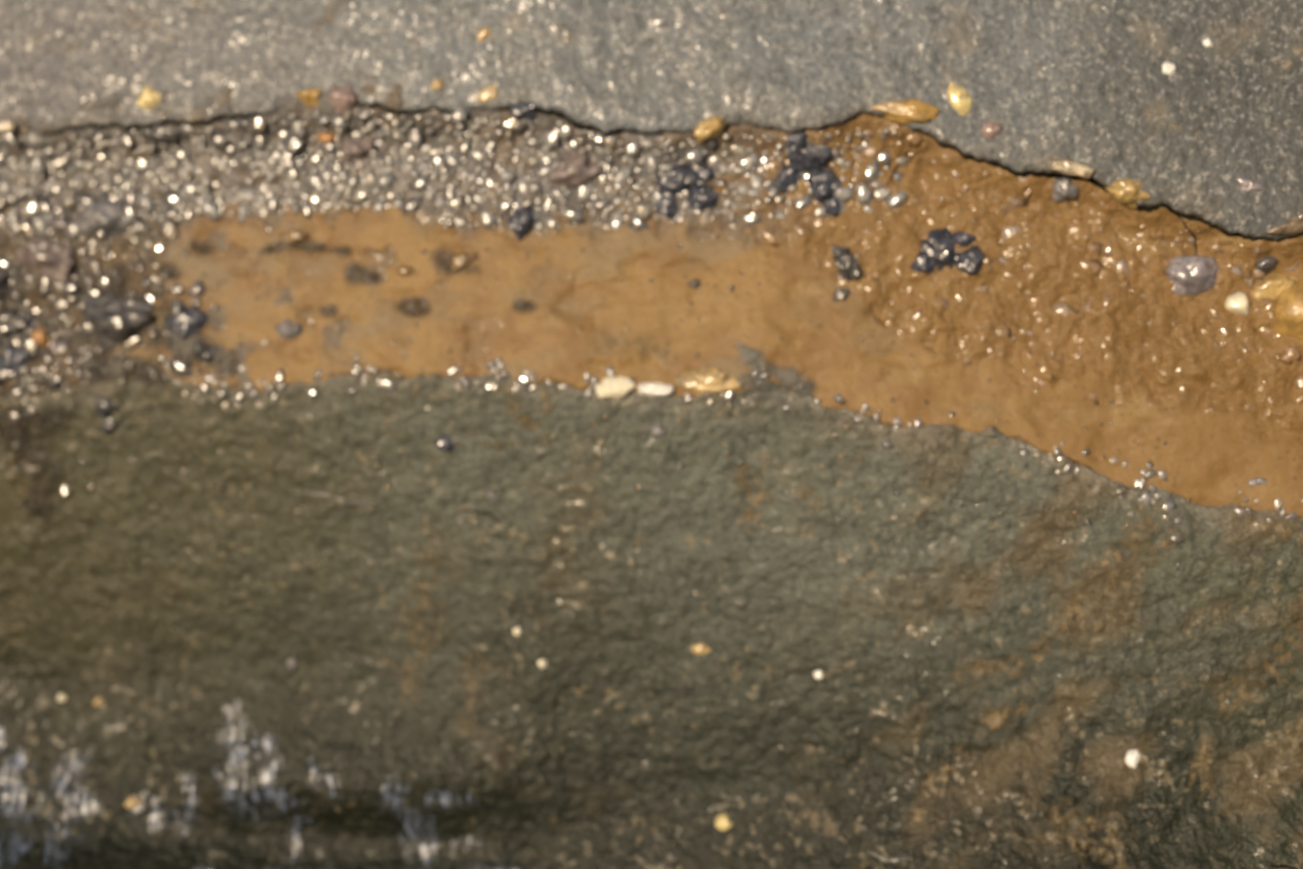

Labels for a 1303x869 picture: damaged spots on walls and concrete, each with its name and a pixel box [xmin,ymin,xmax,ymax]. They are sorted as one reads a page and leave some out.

crack [40,112,265,136]
crack [356,103,456,116]
crack [495,103,644,150]
peeling [1161,62,1176,75]
crack [886,128,1265,255]
spalling [0,76,1303,545]
damp [0,728,31,820]
damp [46,755,98,860]
damp [135,775,198,830]
damp [215,701,339,869]
damp [382,784,471,869]